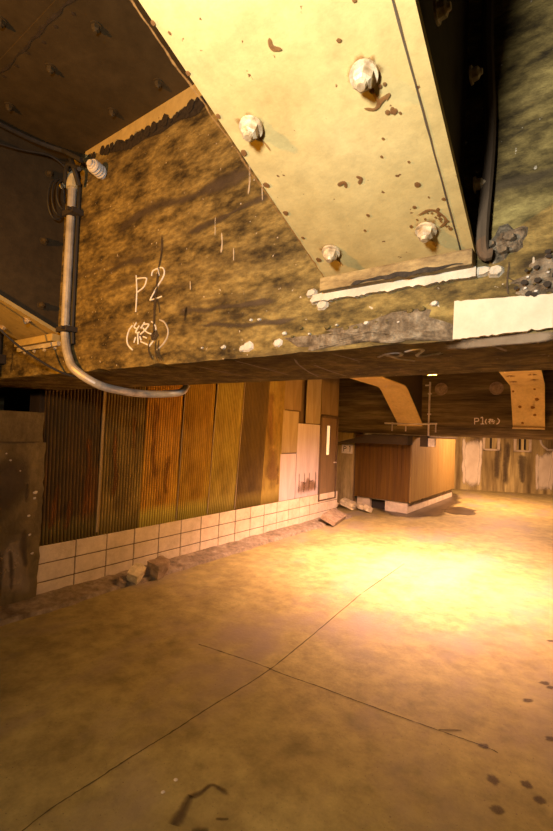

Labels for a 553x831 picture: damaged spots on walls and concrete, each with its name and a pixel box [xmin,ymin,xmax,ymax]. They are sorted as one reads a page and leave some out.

peeling [306,223,528,310]
spalling [509,249,553,297]
spalling [239,341,254,352]
spalling [273,301,478,351]
water stain [462,439,482,485]
water stain [495,444,510,482]
water stain [535,451,553,490]